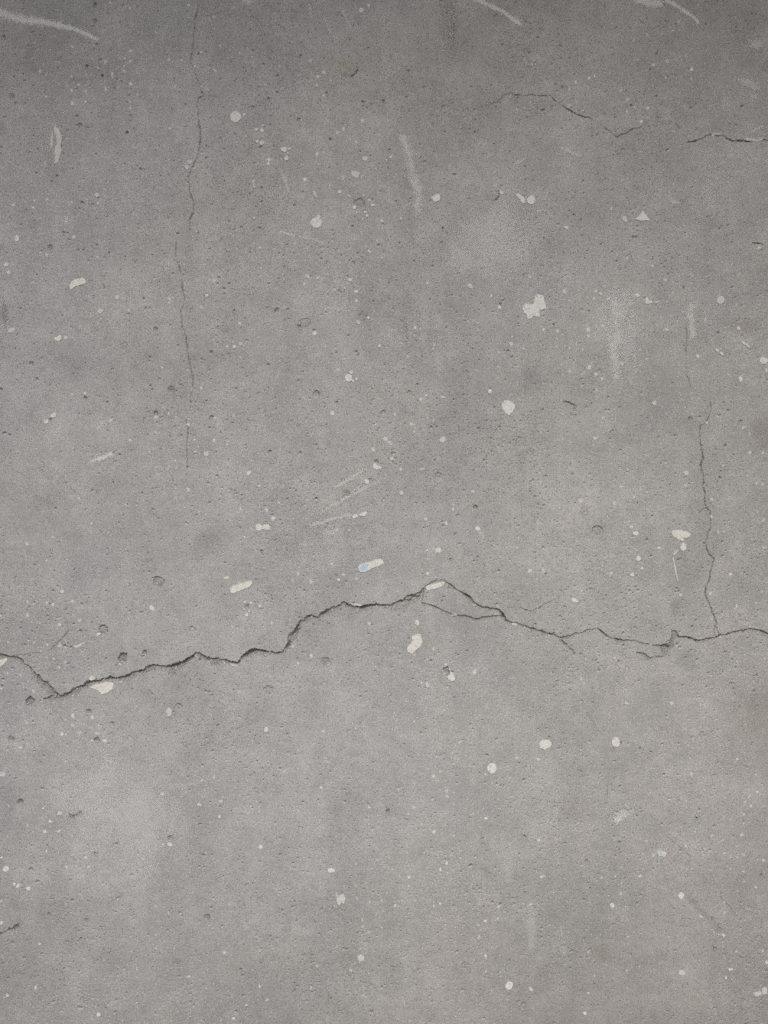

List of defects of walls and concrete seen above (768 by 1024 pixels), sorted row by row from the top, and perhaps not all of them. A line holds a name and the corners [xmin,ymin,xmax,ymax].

crack [175,0,204,481]
crack [444,92,768,143]
crack [0,314,768,702]